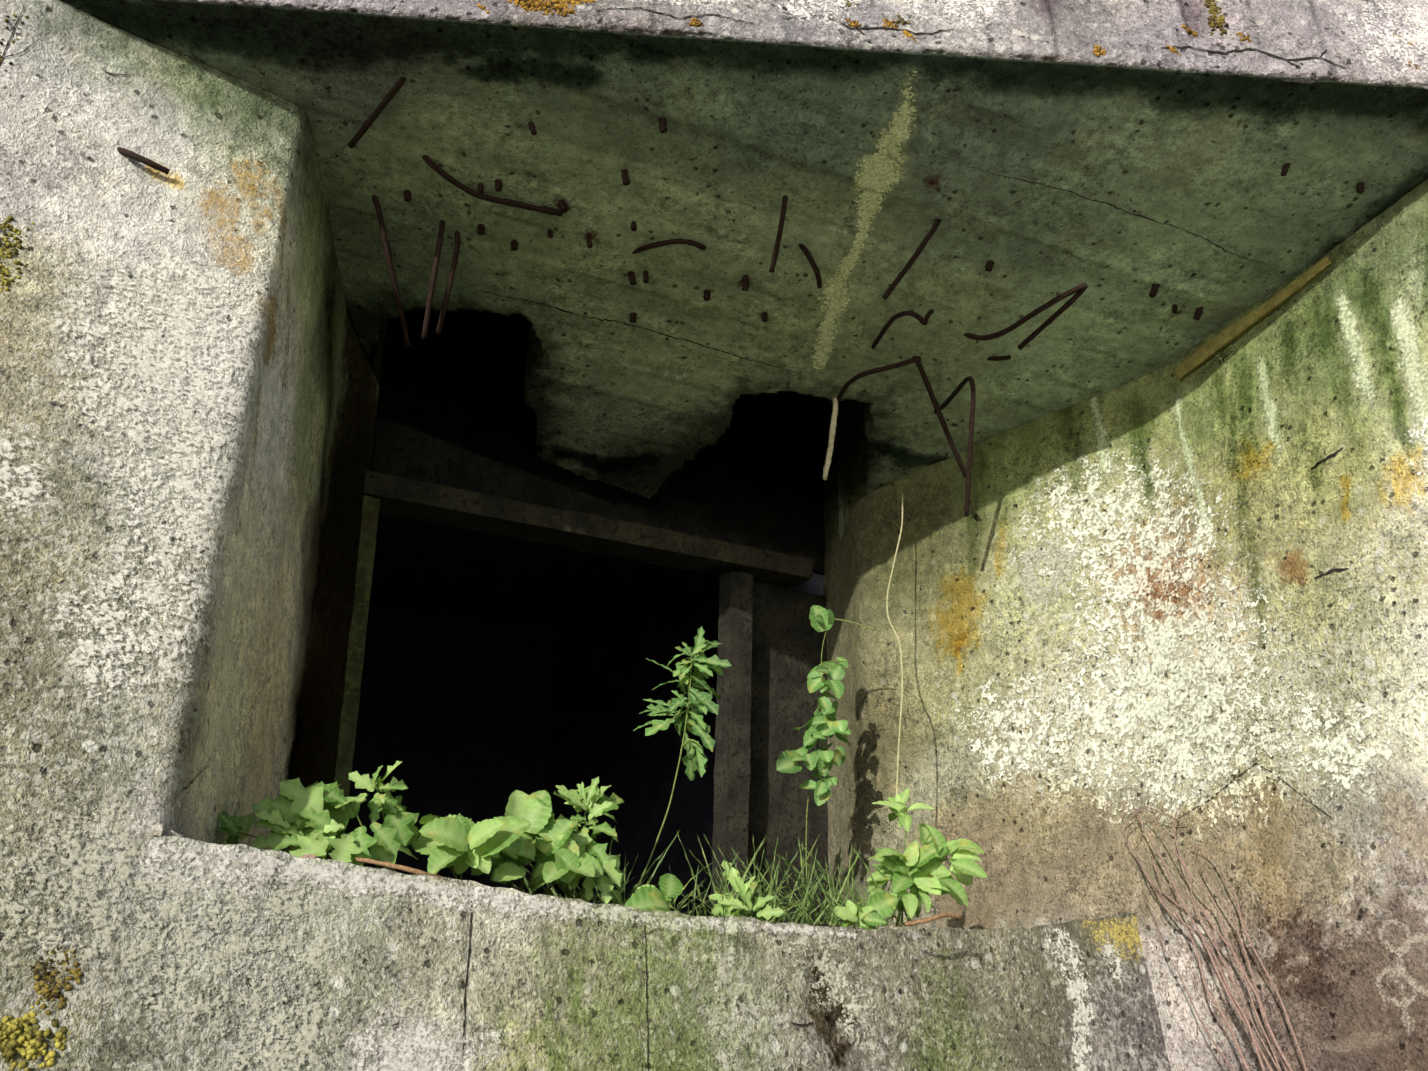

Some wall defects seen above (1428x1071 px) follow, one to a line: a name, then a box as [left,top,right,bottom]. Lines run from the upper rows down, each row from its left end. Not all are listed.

crack [0,4,41,64]
leakage [58,0,1428,375]
spalling [882,219,942,300]
spalling [871,309,934,349]
spalling [836,356,976,517]
leakage [1175,393,1214,542]
leakage [1257,357,1282,451]
leakage [1337,290,1375,408]
crack [462,901,472,1069]
leakage [1317,973,1416,1055]